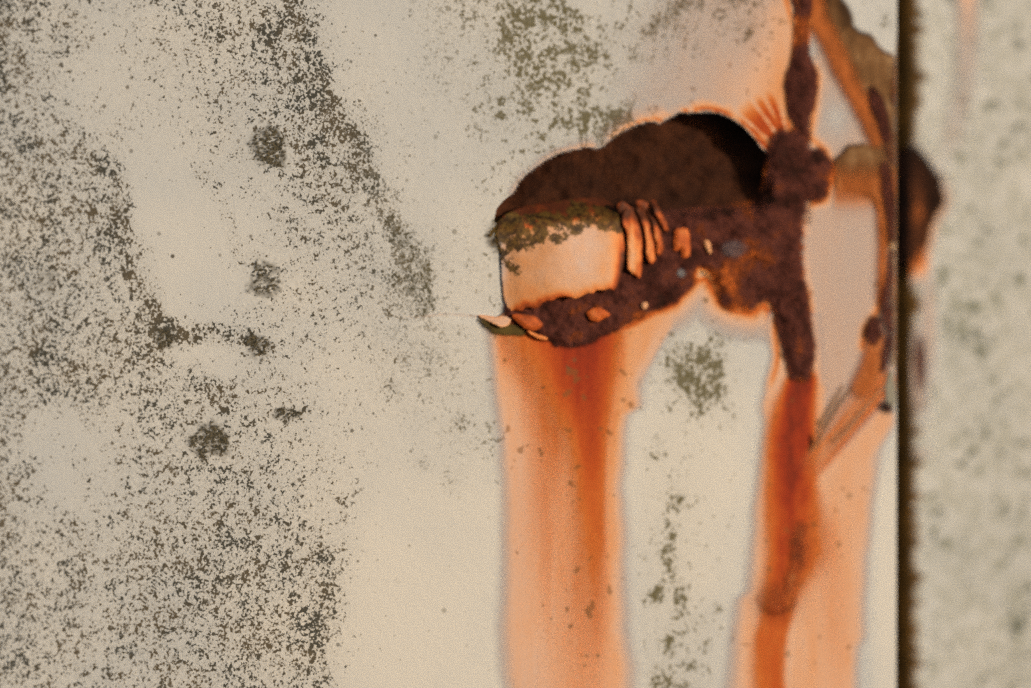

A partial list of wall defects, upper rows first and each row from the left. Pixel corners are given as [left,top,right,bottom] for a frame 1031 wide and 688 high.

water stain [248,124,286,167]
spalling [494,111,774,340]
water stain [247,261,281,306]
water stain [153,327,173,349]
water stain [246,335,274,361]
corrosion [486,0,926,688]
water stain [189,421,230,464]